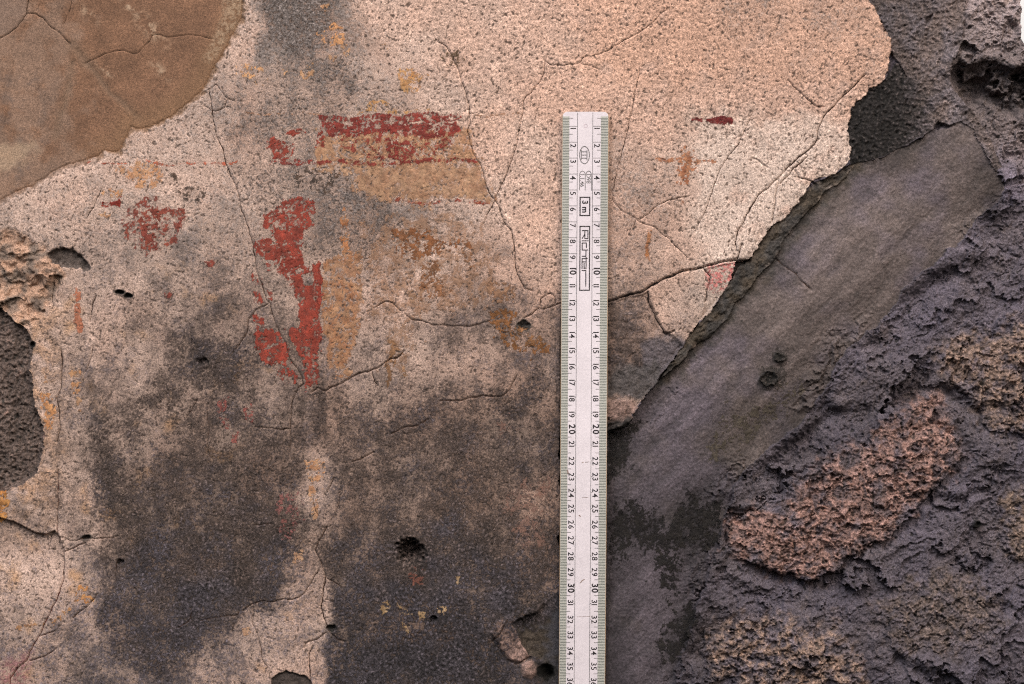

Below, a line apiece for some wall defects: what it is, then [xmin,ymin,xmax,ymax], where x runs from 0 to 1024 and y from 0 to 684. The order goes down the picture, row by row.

crack [207,85,404,446]
crack [436,11,664,318]
peeling [676,145,698,185]
peeling [706,116,733,125]
crack [608,72,866,335]
spalling [0,309,46,494]
crack [394,378,516,433]
crack [178,479,345,681]
damp [91,331,561,684]